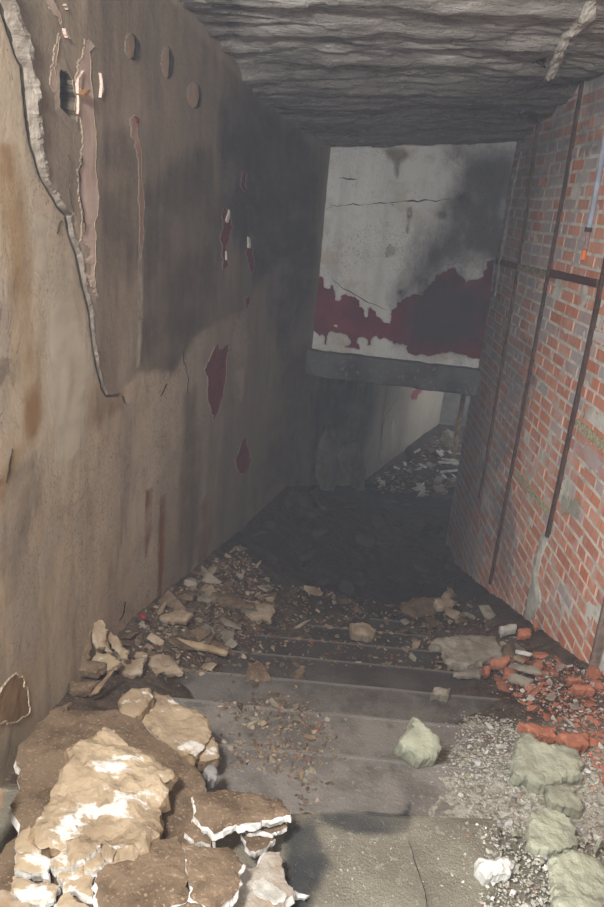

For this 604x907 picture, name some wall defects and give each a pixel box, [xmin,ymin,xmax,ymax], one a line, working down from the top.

spalling [544,0,598,81]
peeling [46,0,104,298]
crack [0,0,127,405]
crack [326,199,453,210]
peeling [313,259,495,360]
peeling [204,342,230,421]
crack [5,448,13,483]
spalling [0,672,31,725]